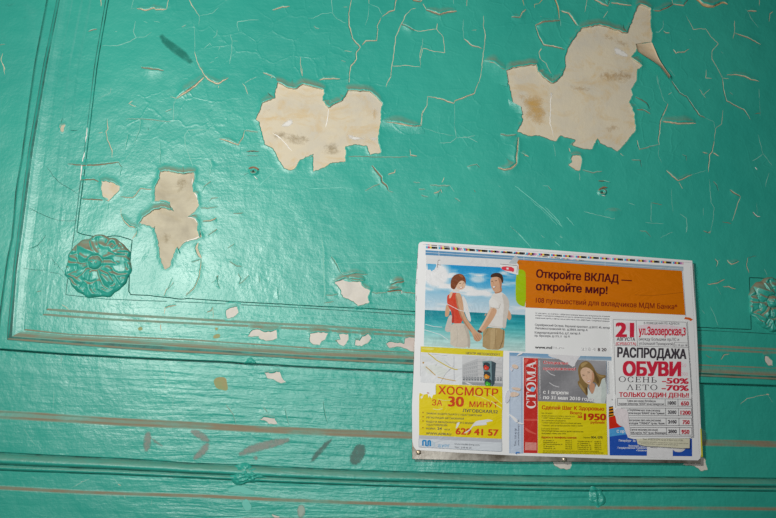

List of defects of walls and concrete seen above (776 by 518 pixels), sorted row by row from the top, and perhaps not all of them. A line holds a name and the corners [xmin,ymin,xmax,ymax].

crack [272,1,290,13]
peeling [97,173,125,205]
peeling [135,162,206,274]
crack [68,0,279,329]
peeling [250,73,424,177]
crack [300,0,507,201]
crack [497,137,530,180]
peeling [481,0,670,175]
crack [620,0,774,238]
peeling [244,323,281,344]
peeling [329,273,374,310]
crack [704,251,767,322]